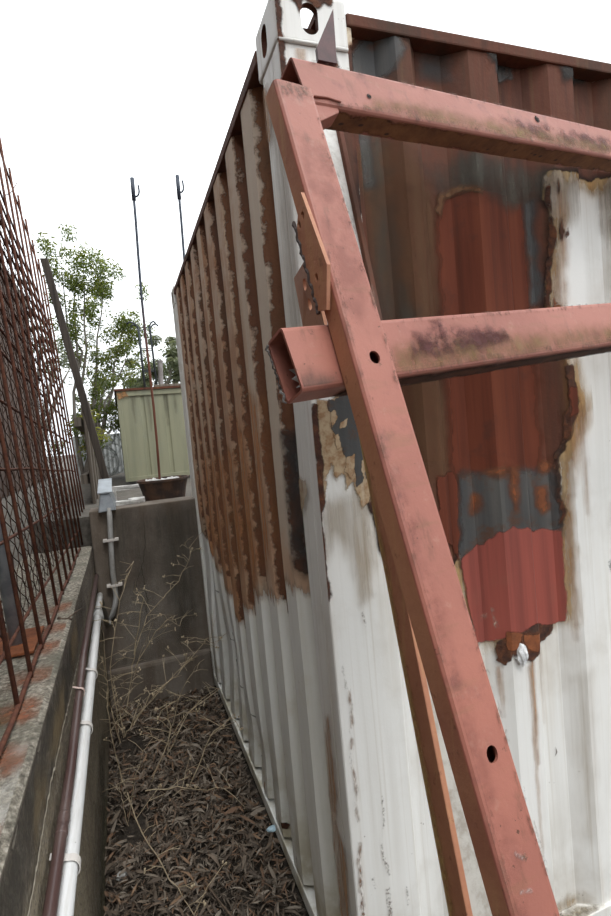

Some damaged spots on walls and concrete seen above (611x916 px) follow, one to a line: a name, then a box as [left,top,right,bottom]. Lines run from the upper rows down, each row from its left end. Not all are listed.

rust [335,36,611,131]
rust [327,111,611,320]
peeling [544,180,569,308]
rust [176,86,310,624]
peeling [317,396,370,508]
rust [398,347,611,565]
peeling [553,364,579,524]
peeling [506,630,540,652]
rust [326,718,348,916]